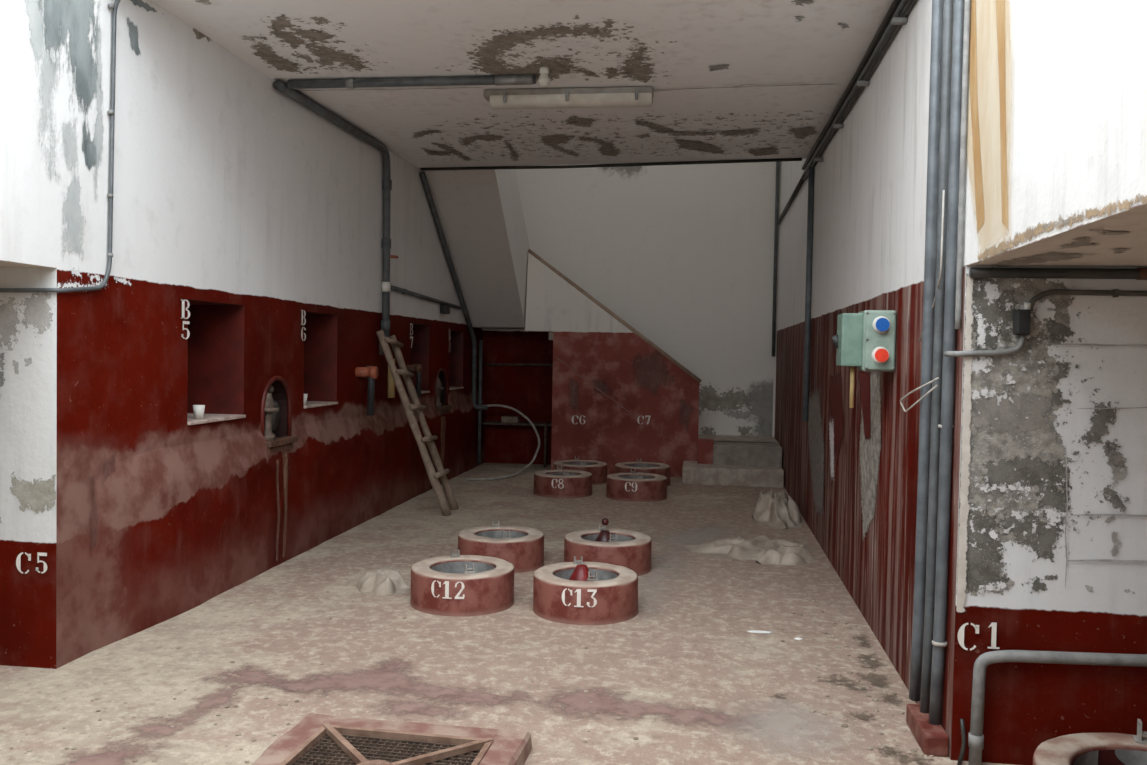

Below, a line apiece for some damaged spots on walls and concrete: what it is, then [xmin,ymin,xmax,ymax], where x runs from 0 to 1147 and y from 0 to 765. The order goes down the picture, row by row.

peeling [127,18,140,55]
peeling [131,0,155,12]
peeling [241,14,380,74]
peeling [467,15,677,83]
peeling [25,0,103,254]
peeling [413,111,829,162]
peeling [0,268,131,374]
spalling [956,194,1147,613]